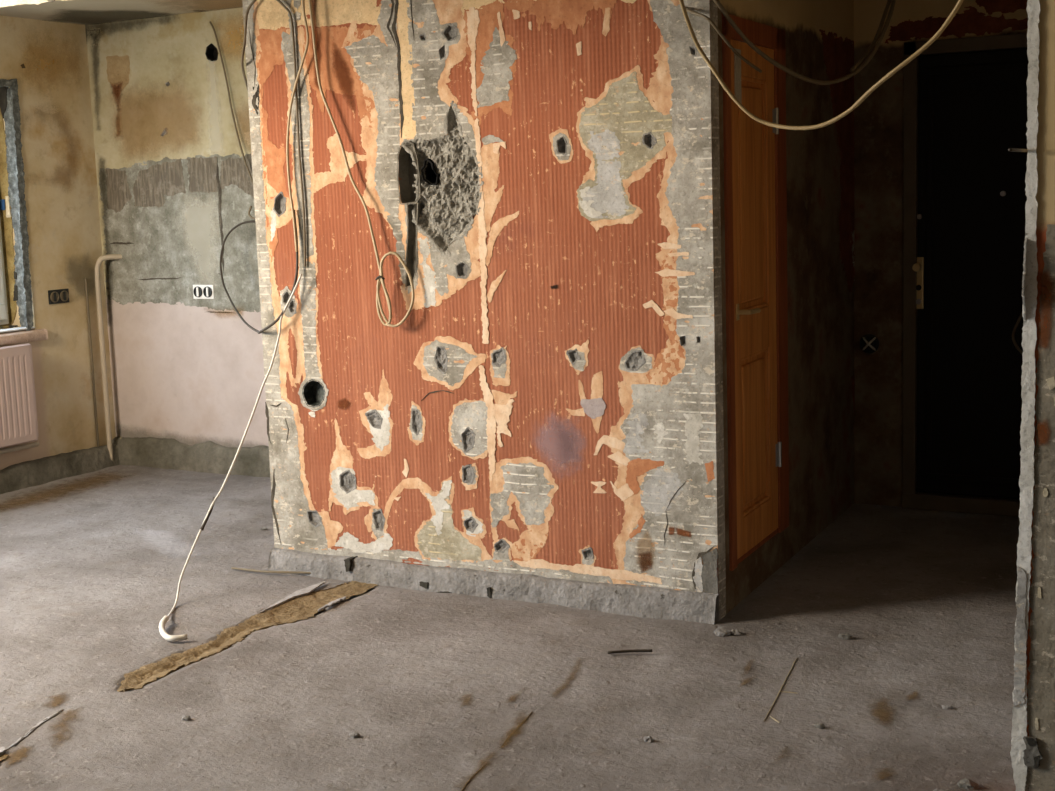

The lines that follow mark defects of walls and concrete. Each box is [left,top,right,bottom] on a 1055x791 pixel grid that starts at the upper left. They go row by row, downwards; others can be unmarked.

damp [55,11,169,99]
flaking render [341,0,517,310]
peeling [99,0,394,572]
spalling [407,401,426,445]
spalling [413,336,554,563]
flaking render [553,0,718,594]
flaking render [885,0,1055,791]
crack [0,694,75,764]
crack [117,581,377,692]